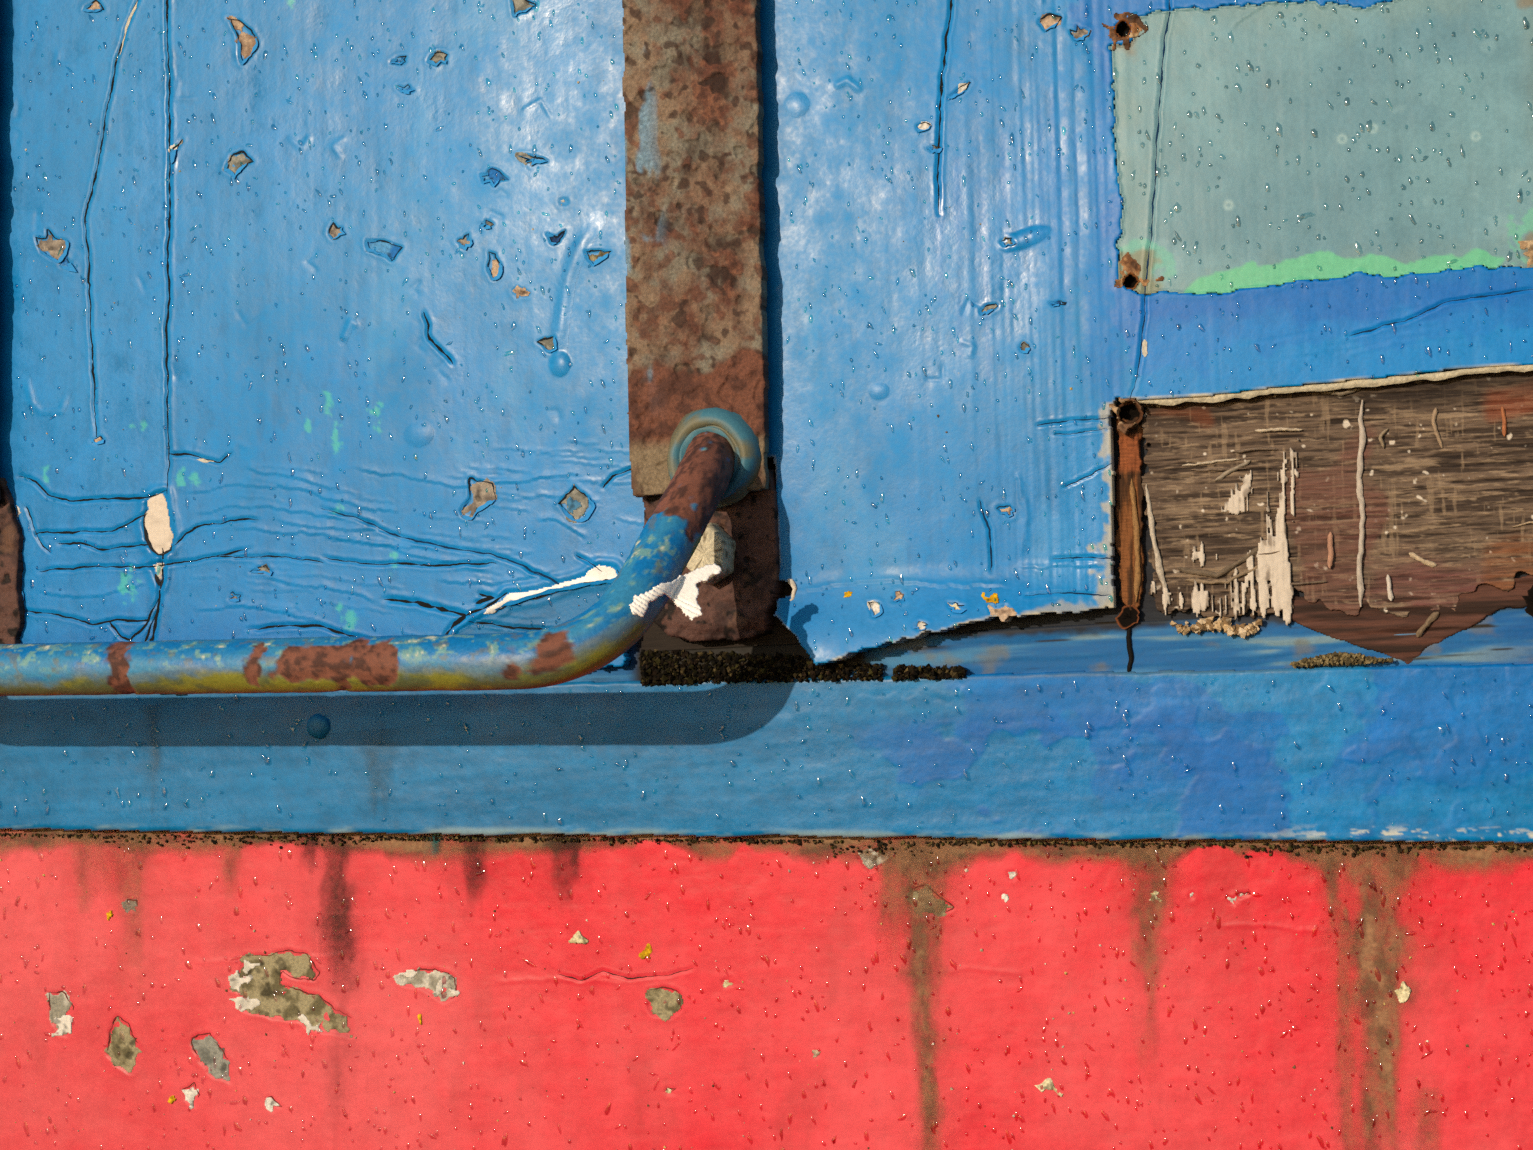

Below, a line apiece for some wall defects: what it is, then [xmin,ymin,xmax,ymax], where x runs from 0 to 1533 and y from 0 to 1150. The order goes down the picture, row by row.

crack [936,0,952,211]
peeling [1108,0,1533,295]
crack [19,0,602,641]
peeling [1133,364,1533,626]
peeling [143,494,174,587]
water stain [1297,841,1347,914]
peeling [45,990,74,1037]
peeling [104,1016,142,1073]
peeling [182,1033,230,1109]
peeling [228,949,353,1038]
peeling [393,967,460,1001]
peeling [645,986,683,1022]